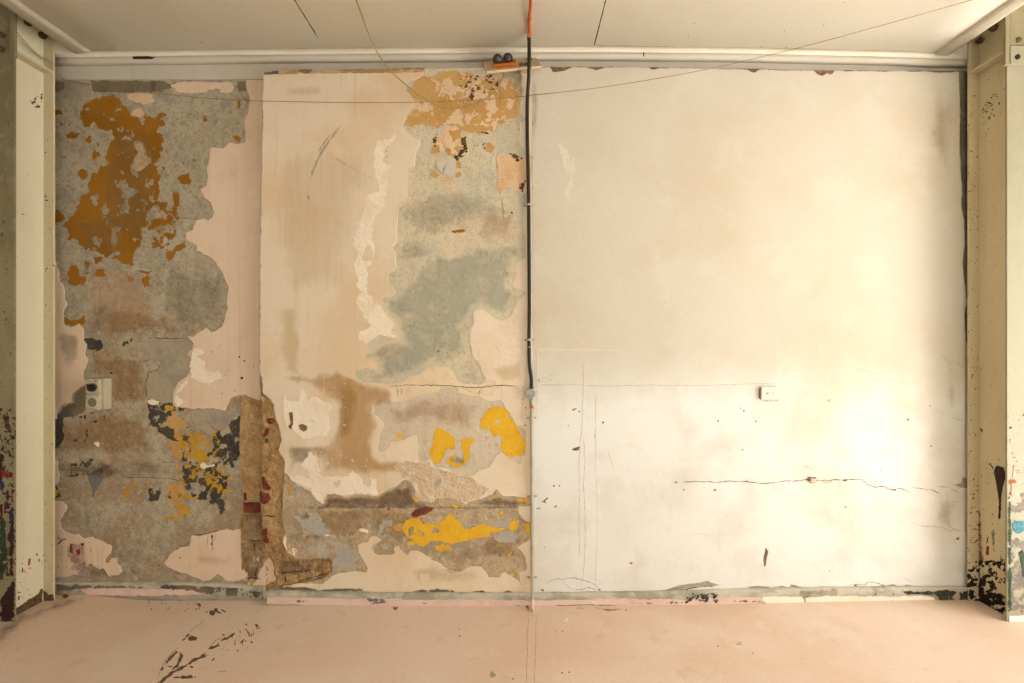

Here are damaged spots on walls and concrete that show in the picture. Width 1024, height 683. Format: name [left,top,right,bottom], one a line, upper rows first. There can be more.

peeling [55,68,557,598]
crack [517,369,810,683]
crack [685,466,964,546]